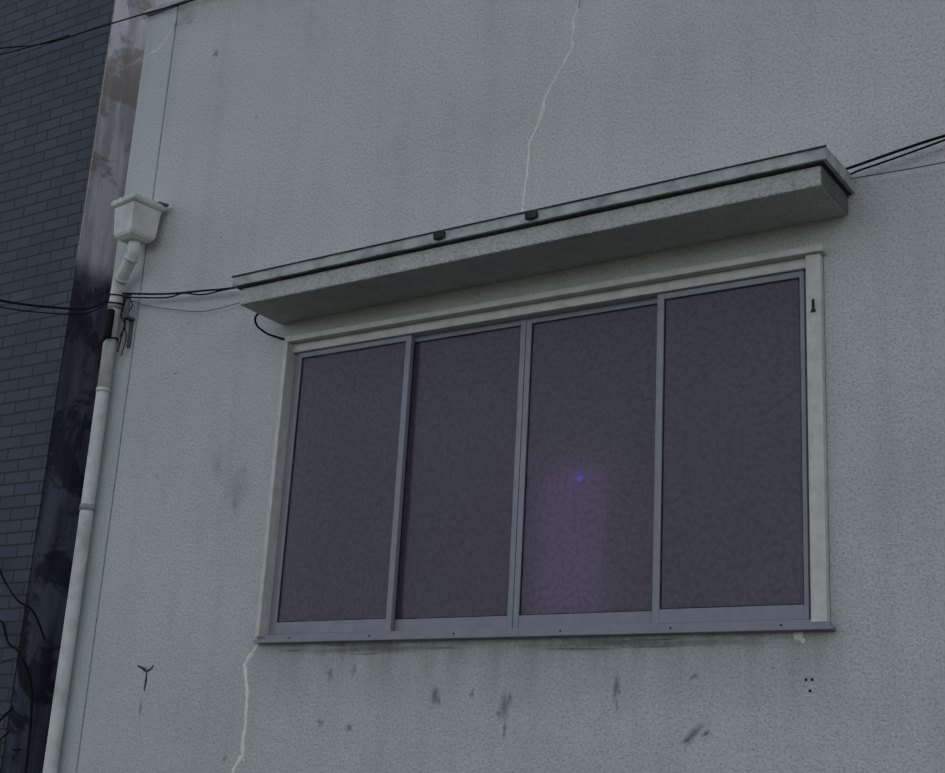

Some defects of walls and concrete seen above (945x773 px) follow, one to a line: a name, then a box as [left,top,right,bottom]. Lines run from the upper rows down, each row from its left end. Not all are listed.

crack [521,0,581,212]
crack [232,644,259,773]